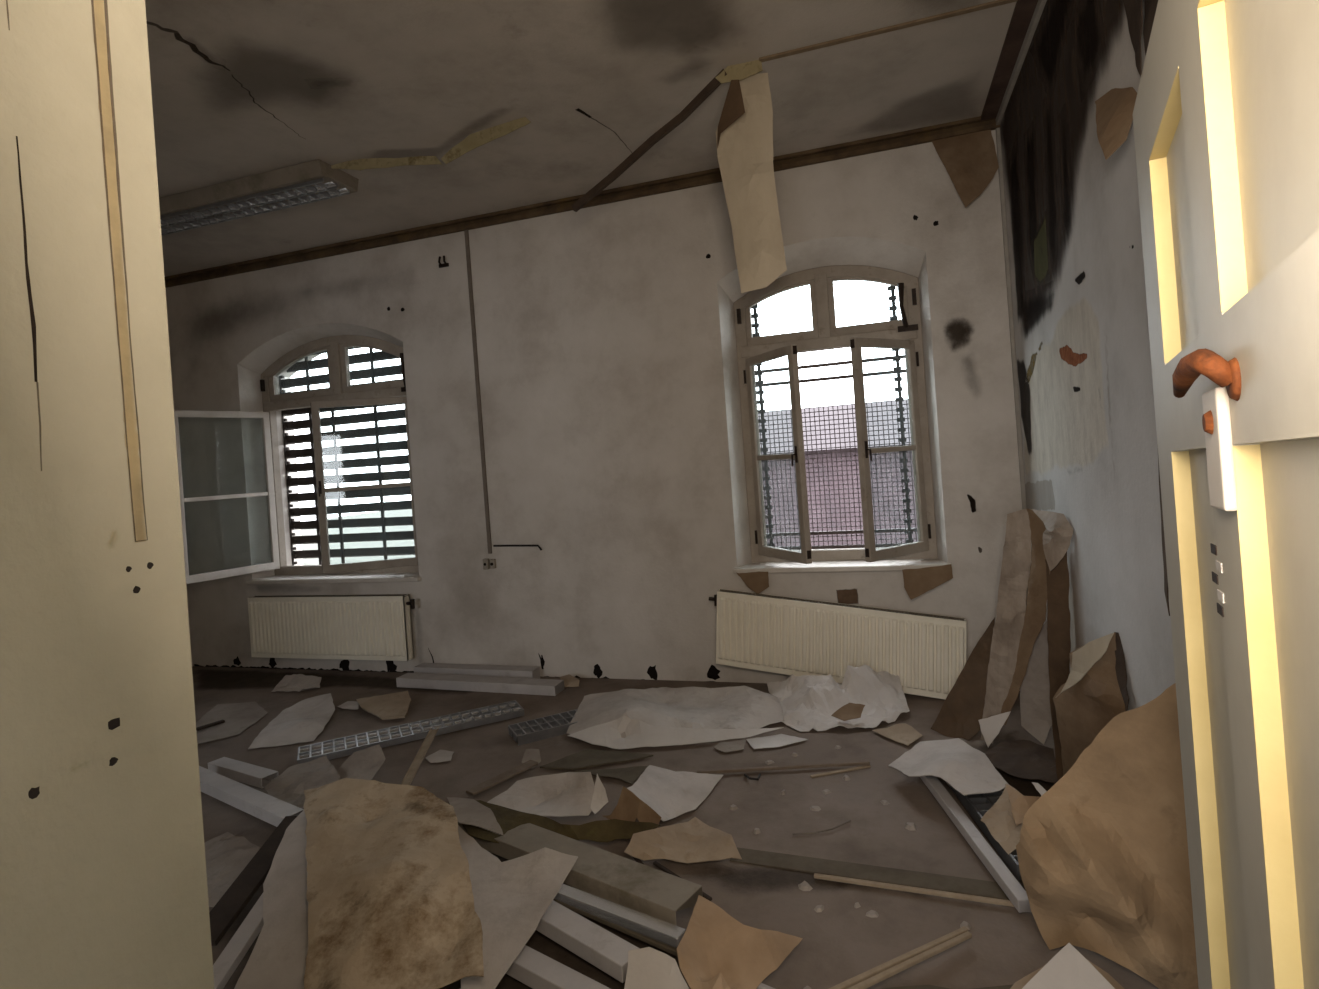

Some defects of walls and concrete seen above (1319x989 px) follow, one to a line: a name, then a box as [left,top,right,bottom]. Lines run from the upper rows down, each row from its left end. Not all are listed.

crack [146,21,305,139]
water stain [1000,0,1124,333]
crack [16,136,42,471]
water stain [946,321,972,349]
peeling [1022,271,1117,502]